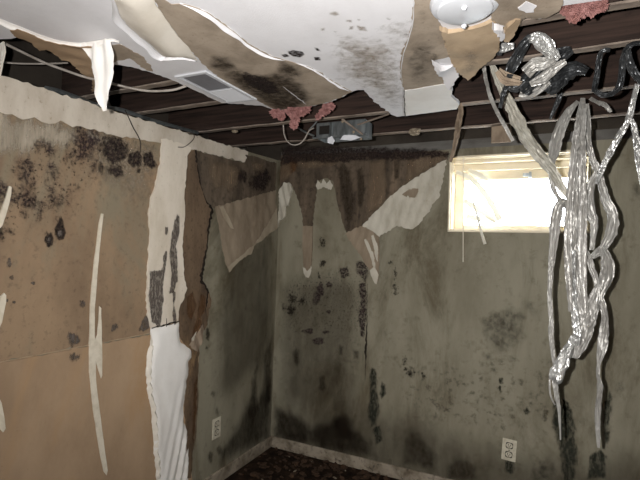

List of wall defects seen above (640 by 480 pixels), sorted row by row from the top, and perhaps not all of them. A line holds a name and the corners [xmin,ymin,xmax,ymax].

peeling [112,44,153,71]
peeling [155,0,352,110]
damp [214,59,306,109]
peeling [400,0,449,90]
damp [66,126,155,188]
damp [280,146,449,215]
damp [44,218,66,247]
crack [195,150,214,311]
peeling [0,76,449,480]
damp [276,413,364,451]
damp [368,369,385,443]
damp [553,400,577,480]